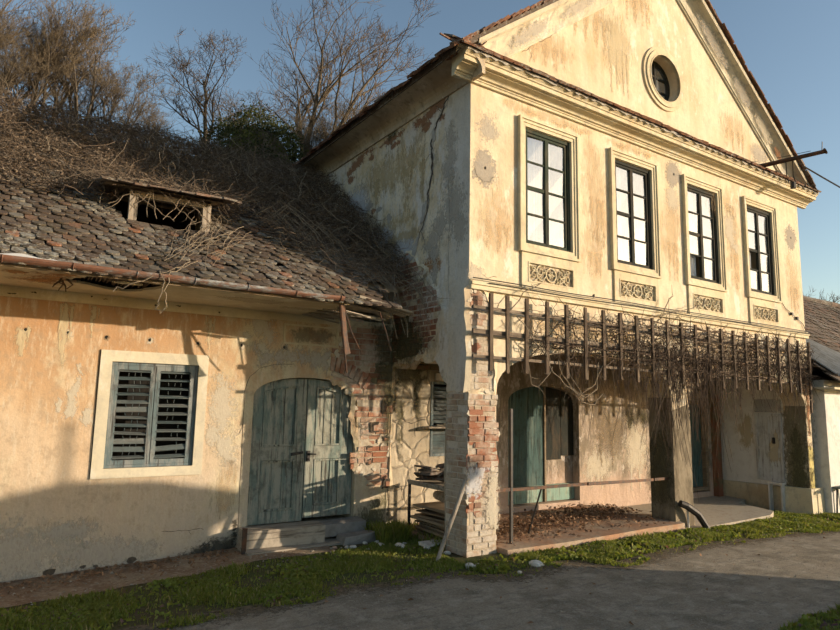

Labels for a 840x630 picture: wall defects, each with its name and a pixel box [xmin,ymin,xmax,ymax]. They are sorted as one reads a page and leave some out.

peeling [347,128,405,184]
peeling [413,98,446,133]
crack [419,96,449,245]
damp [601,15,633,97]
peeling [467,45,819,194]
spalling [325,250,446,494]
flaking render [444,262,500,558]